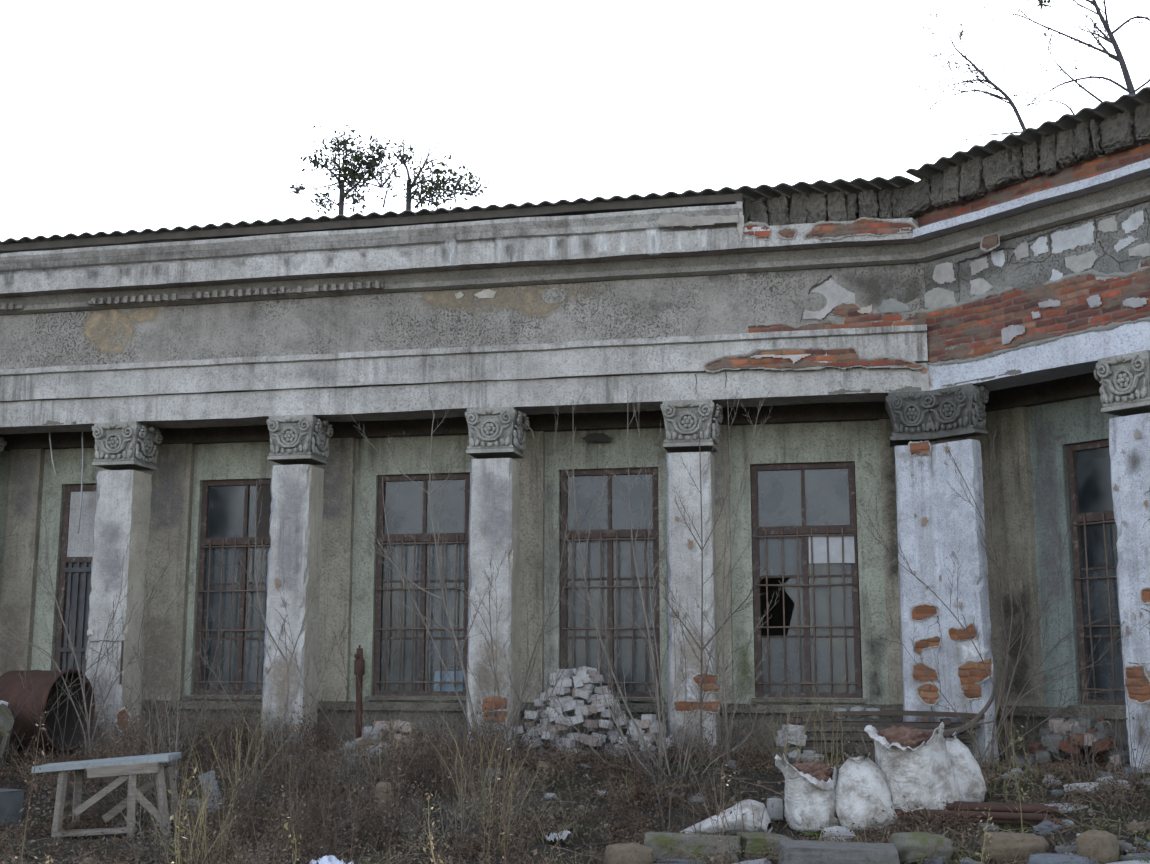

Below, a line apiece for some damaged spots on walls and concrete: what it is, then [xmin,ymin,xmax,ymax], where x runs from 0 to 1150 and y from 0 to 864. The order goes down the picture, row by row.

spalling [656,142,1150,242]
spalling [703,210,1150,392]
spalling [908,441,931,457]
spalling [910,574,942,622]
spalling [673,672,721,736]
spalling [912,622,979,712]
spalling [958,657,993,700]
spalling [1125,664,1150,708]